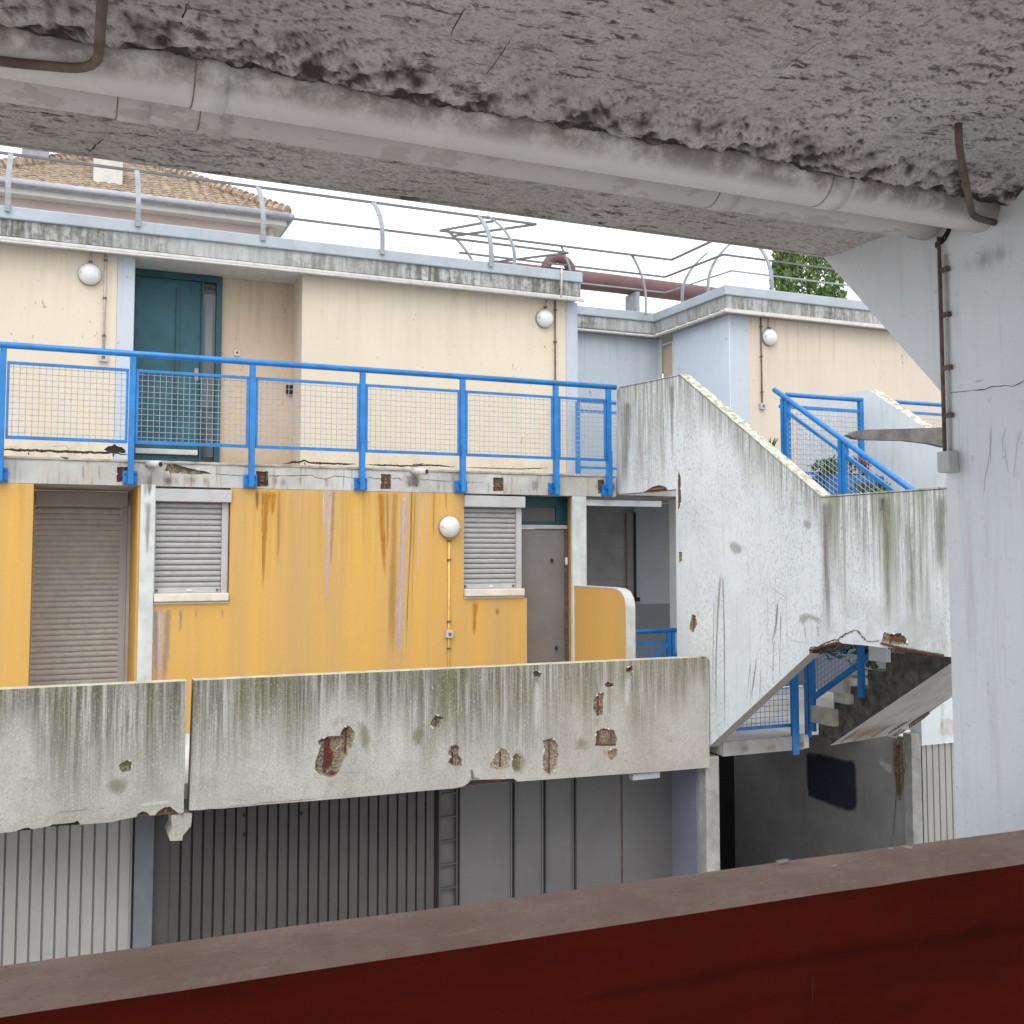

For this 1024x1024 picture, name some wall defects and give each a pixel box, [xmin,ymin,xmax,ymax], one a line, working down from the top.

crack [952,380,1023,393]
corrosion [256,471,275,573]
corrosion [379,474,392,559]
spalling [809,639,850,653]
spalling [880,632,950,658]
spalling [593,682,619,761]
spalling [314,725,355,779]
spalling [448,745,463,766]
spalling [465,747,522,786]
spalling [542,737,558,775]
spalling [136,806,246,817]